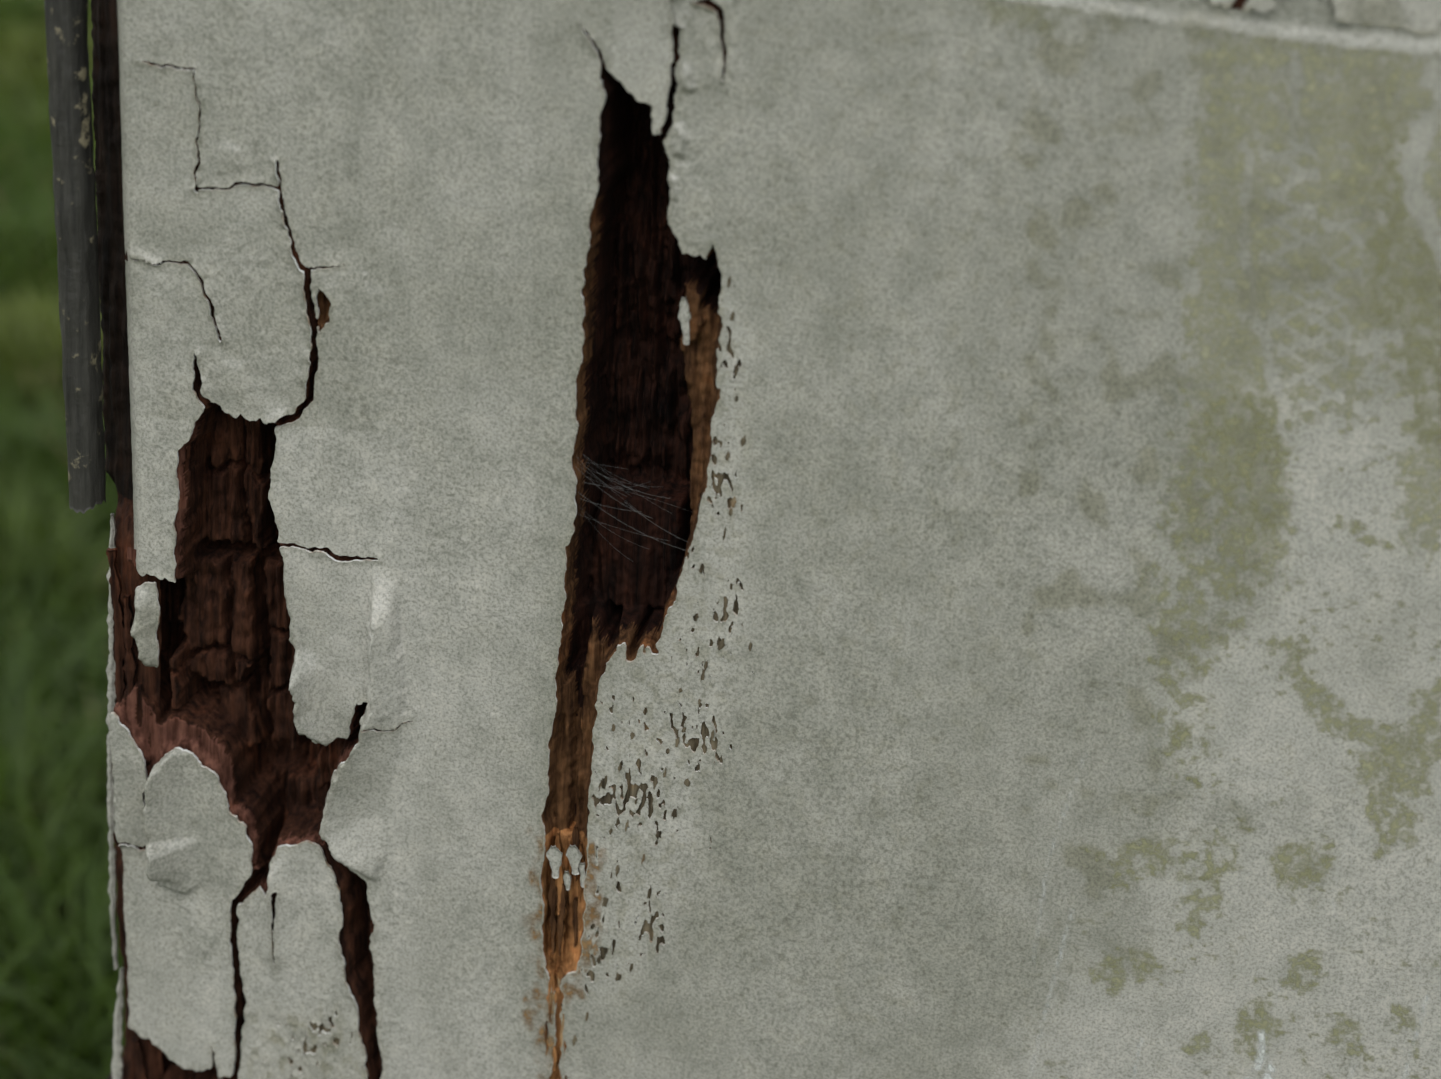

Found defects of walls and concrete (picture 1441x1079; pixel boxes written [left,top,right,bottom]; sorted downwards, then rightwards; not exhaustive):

crack [1230,0,1248,10]
peeling [1209,0,1276,12]
peeling [1409,0,1441,36]
crack [144,61,333,426]
crack [125,250,222,409]
spalling [546,0,752,1021]
peeling [109,548,388,1079]
peeling [1256,1031,1274,1079]